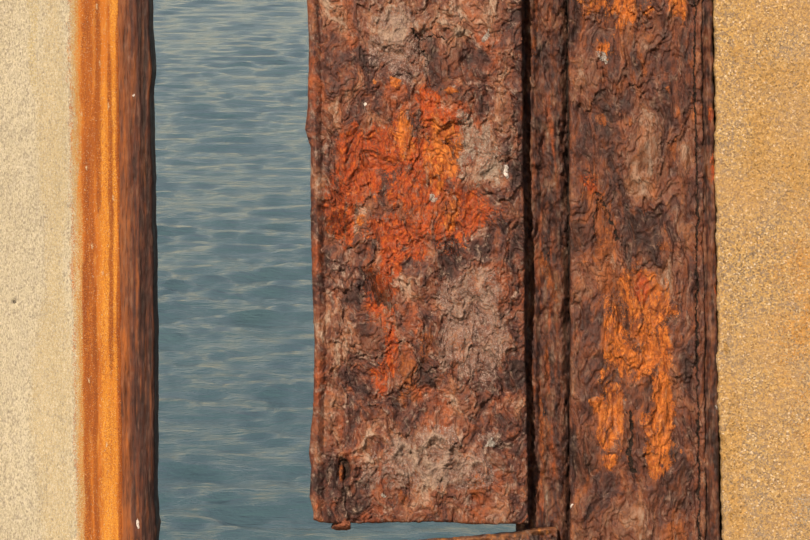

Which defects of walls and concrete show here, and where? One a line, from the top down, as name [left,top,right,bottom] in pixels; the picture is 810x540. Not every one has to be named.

corrosion [577,0,655,61]
corrosion [666,0,688,28]
corrosion [65,0,123,540]
corrosion [321,80,504,409]
corrosion [579,170,683,480]
corrosion [360,424,505,506]
corrosion [537,397,550,491]
crack [626,411,637,473]
corrosion [331,520,351,530]